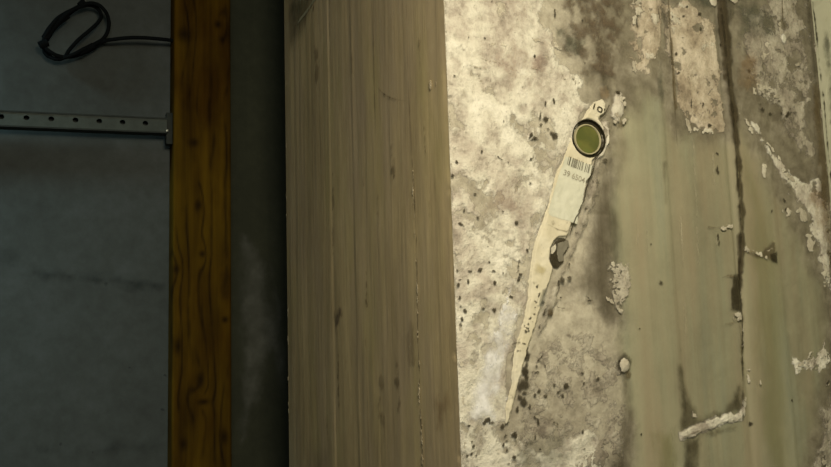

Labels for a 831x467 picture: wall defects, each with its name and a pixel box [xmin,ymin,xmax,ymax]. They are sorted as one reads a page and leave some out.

damp [629,0,726,134]
damp [740,0,816,158]
damp [444,0,625,467]
damp [595,210,631,314]
spalling [747,243,777,262]
damp [739,113,831,290]
damp [686,440,698,467]
damp [682,400,704,427]